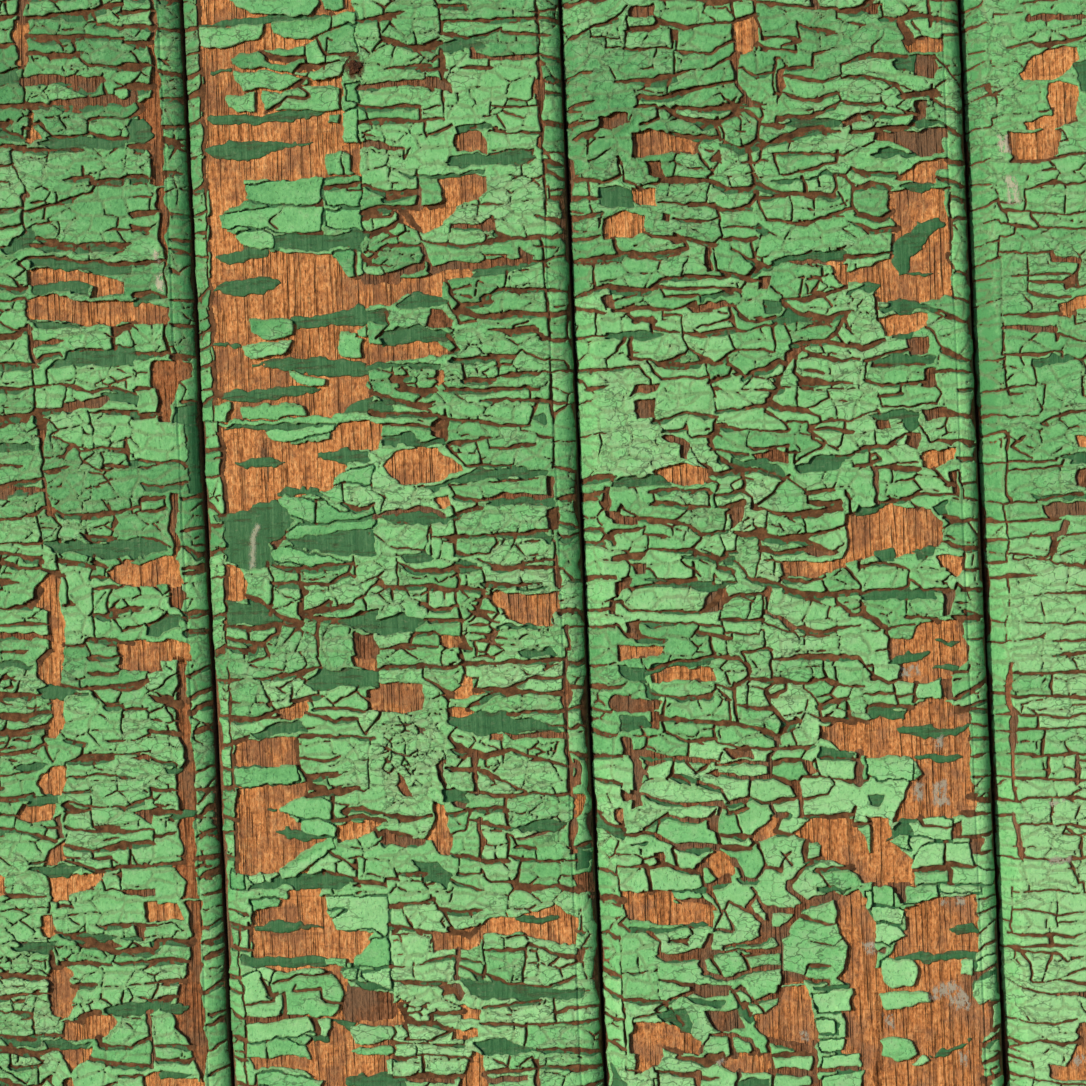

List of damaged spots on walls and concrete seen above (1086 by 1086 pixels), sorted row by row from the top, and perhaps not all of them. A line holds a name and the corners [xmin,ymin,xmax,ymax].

crack [880,0,987,47]
crack [931,151,1086,325]
peeling [0,0,231,1086]
peeling [183,0,604,1086]
crack [0,776,187,895]
crack [59,728,181,796]
crack [912,840,978,885]
crack [945,638,1086,897]
crack [86,1009,196,1086]
crack [322,837,697,1086]
crack [626,1031,861,1086]
crack [972,882,1086,1086]